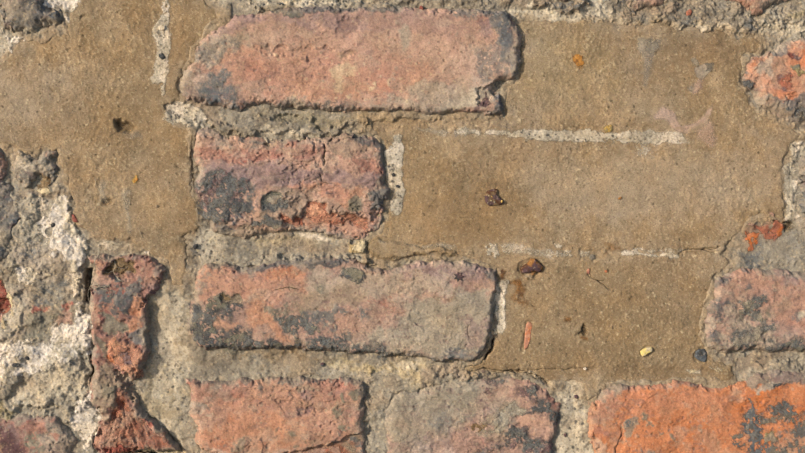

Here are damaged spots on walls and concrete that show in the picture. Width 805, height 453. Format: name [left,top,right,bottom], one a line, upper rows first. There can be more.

crack [484,338,584,383]